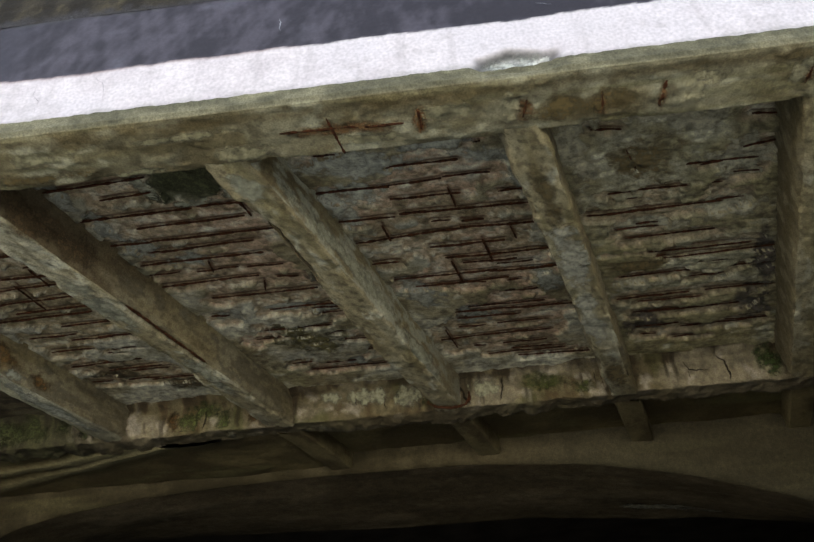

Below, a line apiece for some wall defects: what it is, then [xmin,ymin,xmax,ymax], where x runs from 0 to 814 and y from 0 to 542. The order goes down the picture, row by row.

spalling [0,249,195,388]
spalling [42,174,391,375]
spalling [313,136,590,360]
spalling [579,102,779,340]
crack [684,355,731,379]